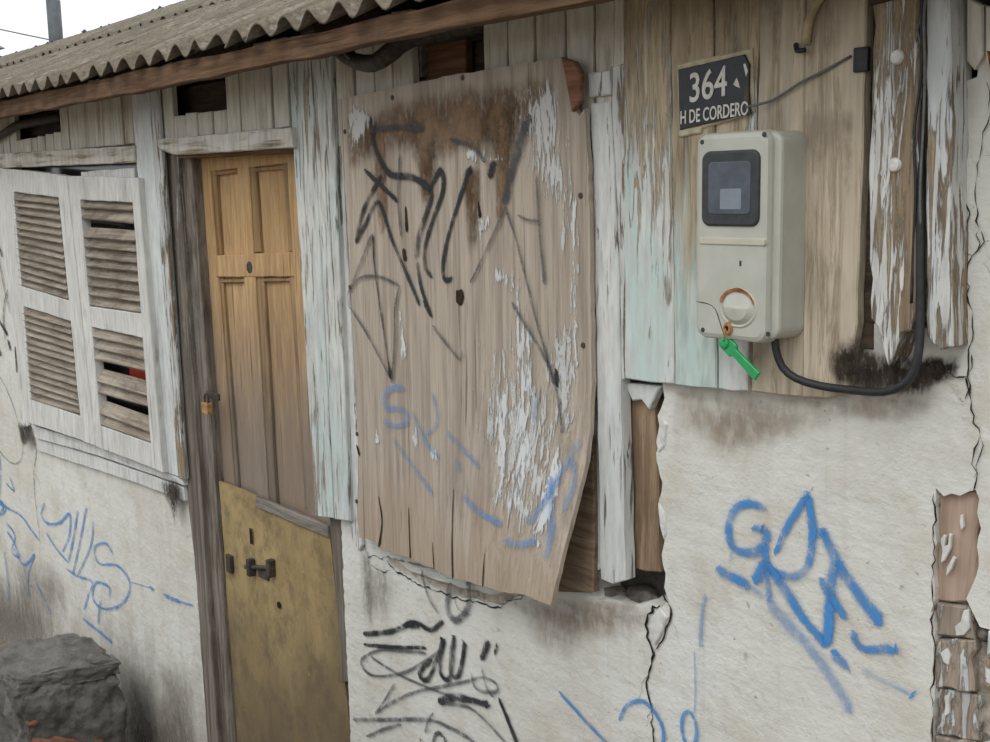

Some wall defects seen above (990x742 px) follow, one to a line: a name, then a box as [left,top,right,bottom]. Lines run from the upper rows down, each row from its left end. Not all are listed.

peeling [349,78,579,557]
water stain [831,339,957,393]
crack [933,82,990,492]
flaking render [393,558,522,604]
crack [638,594,678,742]
flaking render [935,490,990,742]